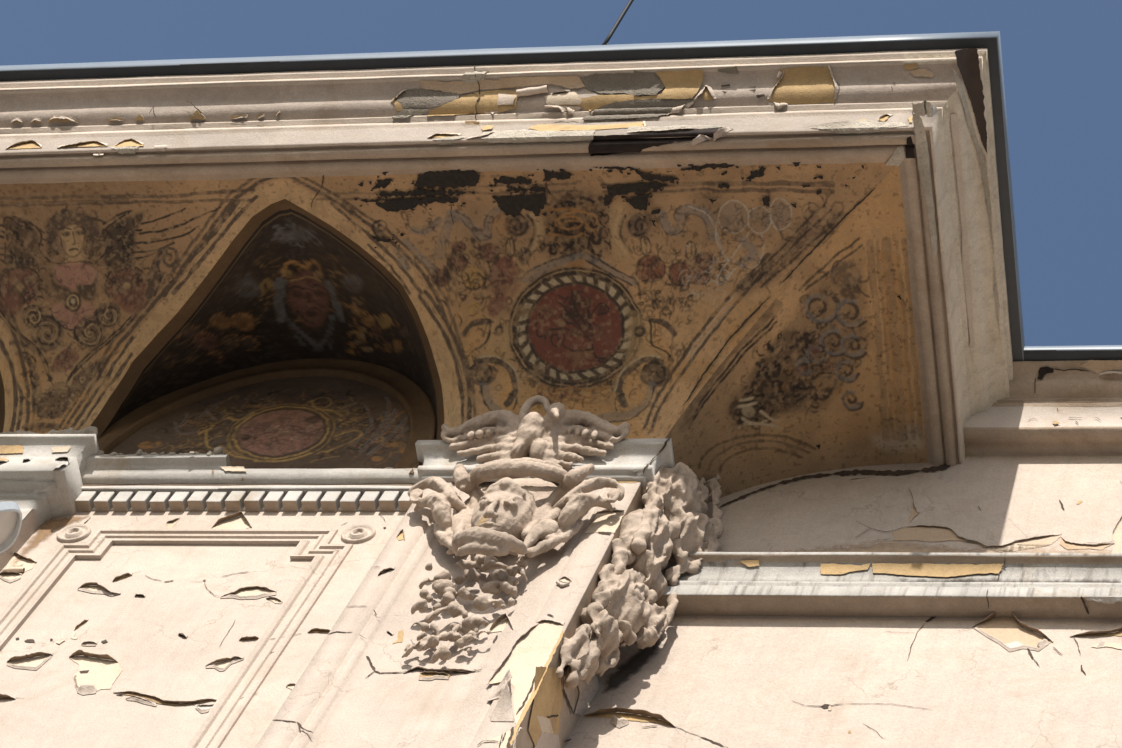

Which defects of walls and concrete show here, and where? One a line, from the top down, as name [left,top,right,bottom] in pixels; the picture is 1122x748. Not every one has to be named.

spalling [750,66,840,110]
peeling [57,138,167,155]
spalling [391,66,801,227]
peeling [354,169,574,225]
spalling [820,489,1122,577]
peeling [0,552,37,583]
peeling [220,586,283,604]
peeling [7,619,122,695]
peeling [205,656,244,672]
spalling [478,613,676,748]
peeling [958,611,1061,666]
peeling [1070,627,1122,655]